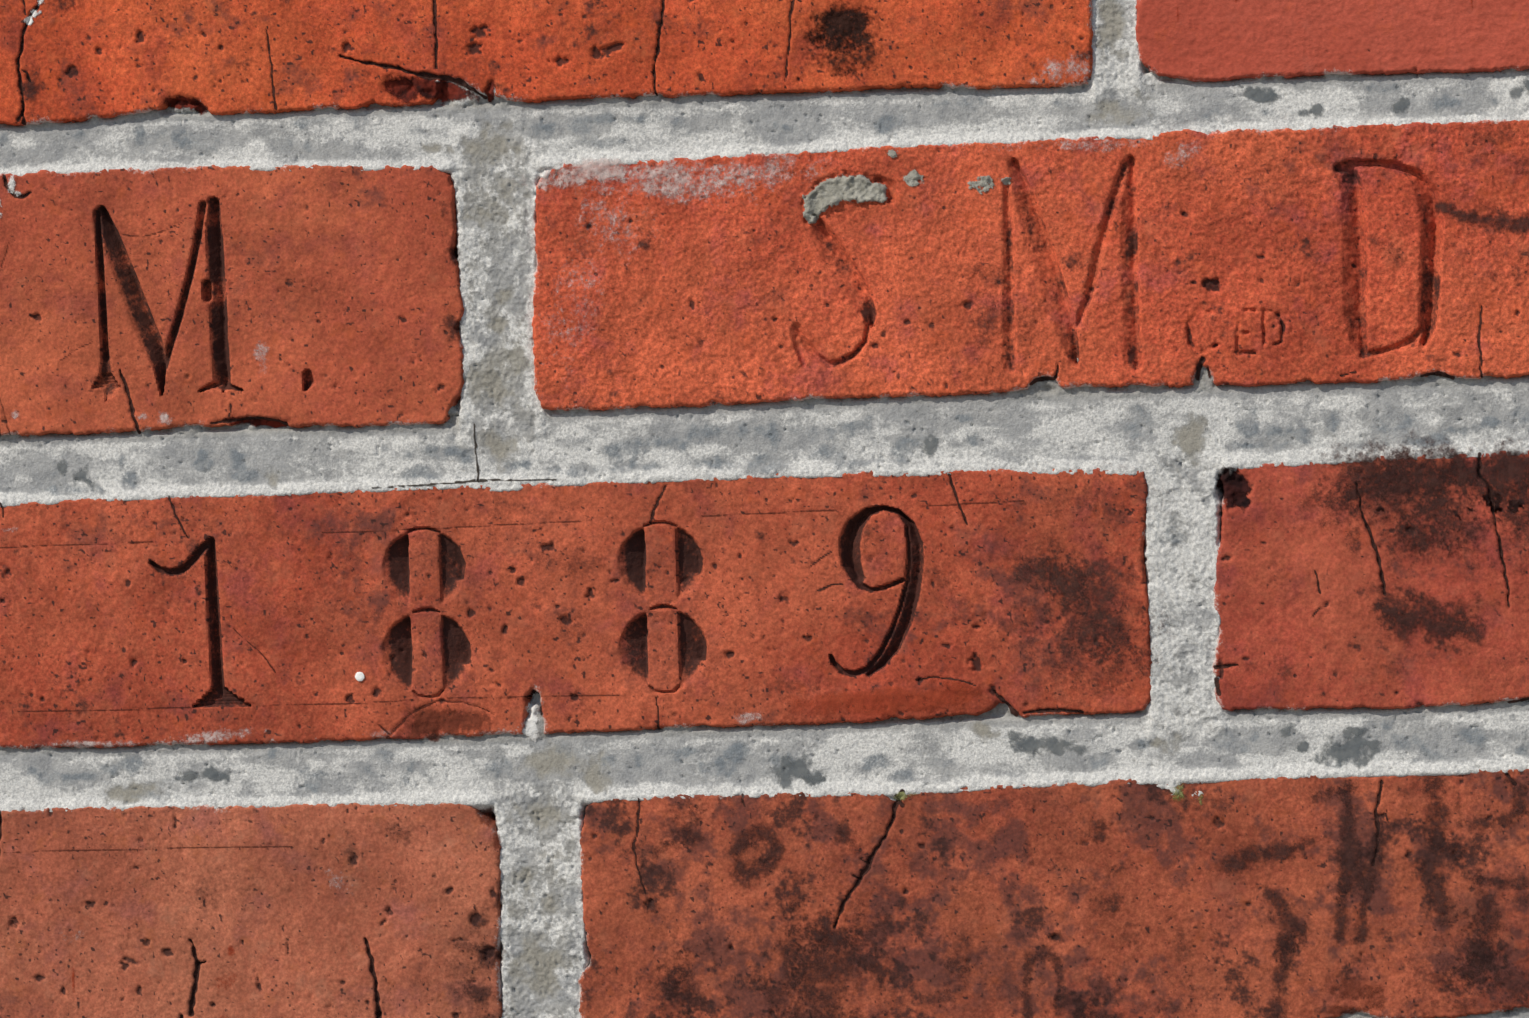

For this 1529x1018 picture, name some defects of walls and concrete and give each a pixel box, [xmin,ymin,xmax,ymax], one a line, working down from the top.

crack [16,0,40,125]
crack [339,0,488,99]
crack [652,0,665,96]
spalling [1216,467,1252,509]
water stain [1014,558,1134,670]
crack [833,789,905,929]
water stain [1222,838,1315,872]
water stain [1282,725,1383,942]
water stain [1418,778,1529,1011]
crack [180,939,206,1018]
crack [364,938,382,1018]
water stain [1263,888,1307,1018]